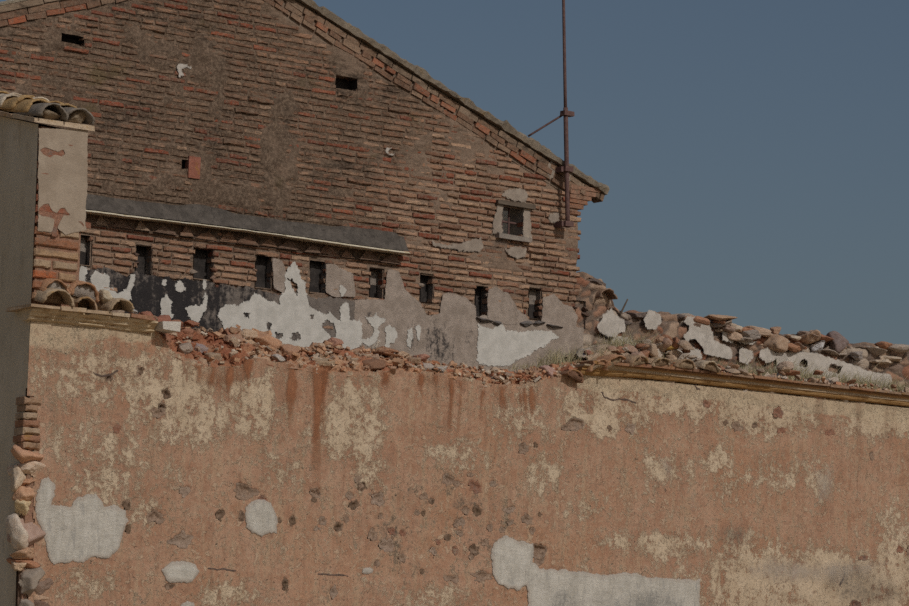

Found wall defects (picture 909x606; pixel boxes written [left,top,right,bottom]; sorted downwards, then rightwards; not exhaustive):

flaking render [31,128,139,304]
peeling [160,279,186,318]
peeling [185,269,216,322]
peeling [217,262,421,350]
peeling [476,324,559,367]
flaking render [5,396,46,606]
flaking render [32,578,54,606]